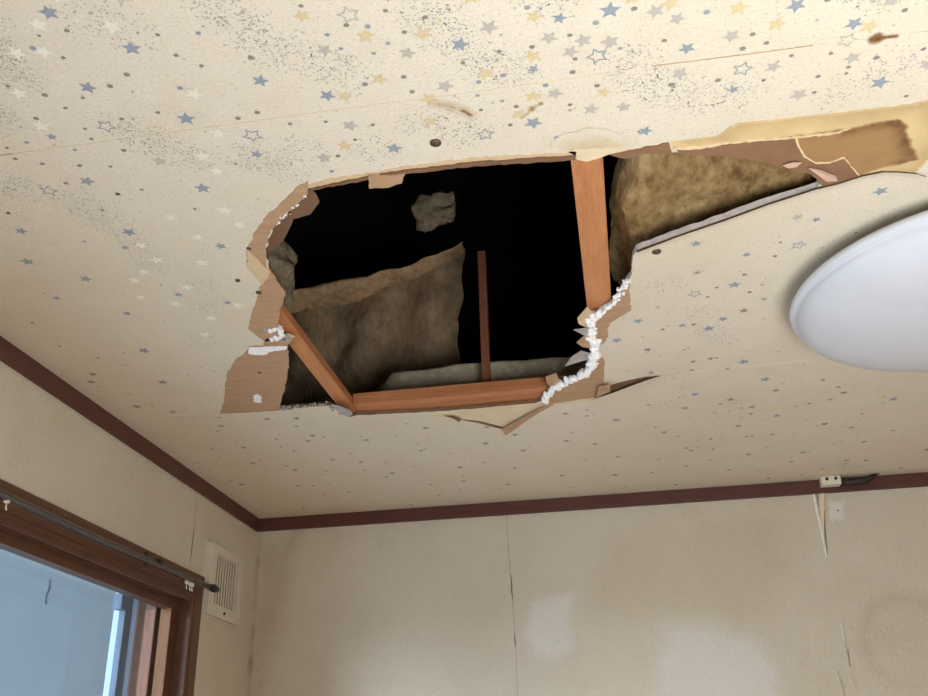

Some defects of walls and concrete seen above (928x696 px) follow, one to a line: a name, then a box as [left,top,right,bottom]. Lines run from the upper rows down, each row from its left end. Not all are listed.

peeling [220,100,928,436]